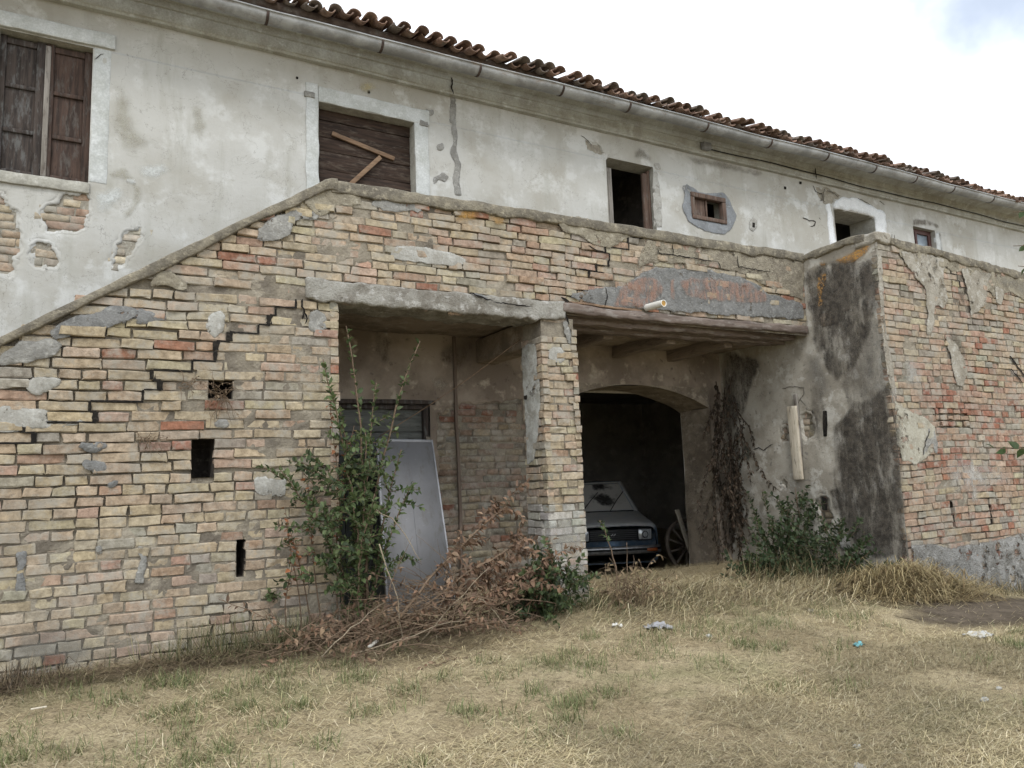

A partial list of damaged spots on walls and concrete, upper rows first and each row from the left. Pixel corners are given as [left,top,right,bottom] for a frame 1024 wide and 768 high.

spalling [0,190,119,281]
peeling [98,225,153,271]
water stain [806,260,878,377]
water stain [831,388,909,563]